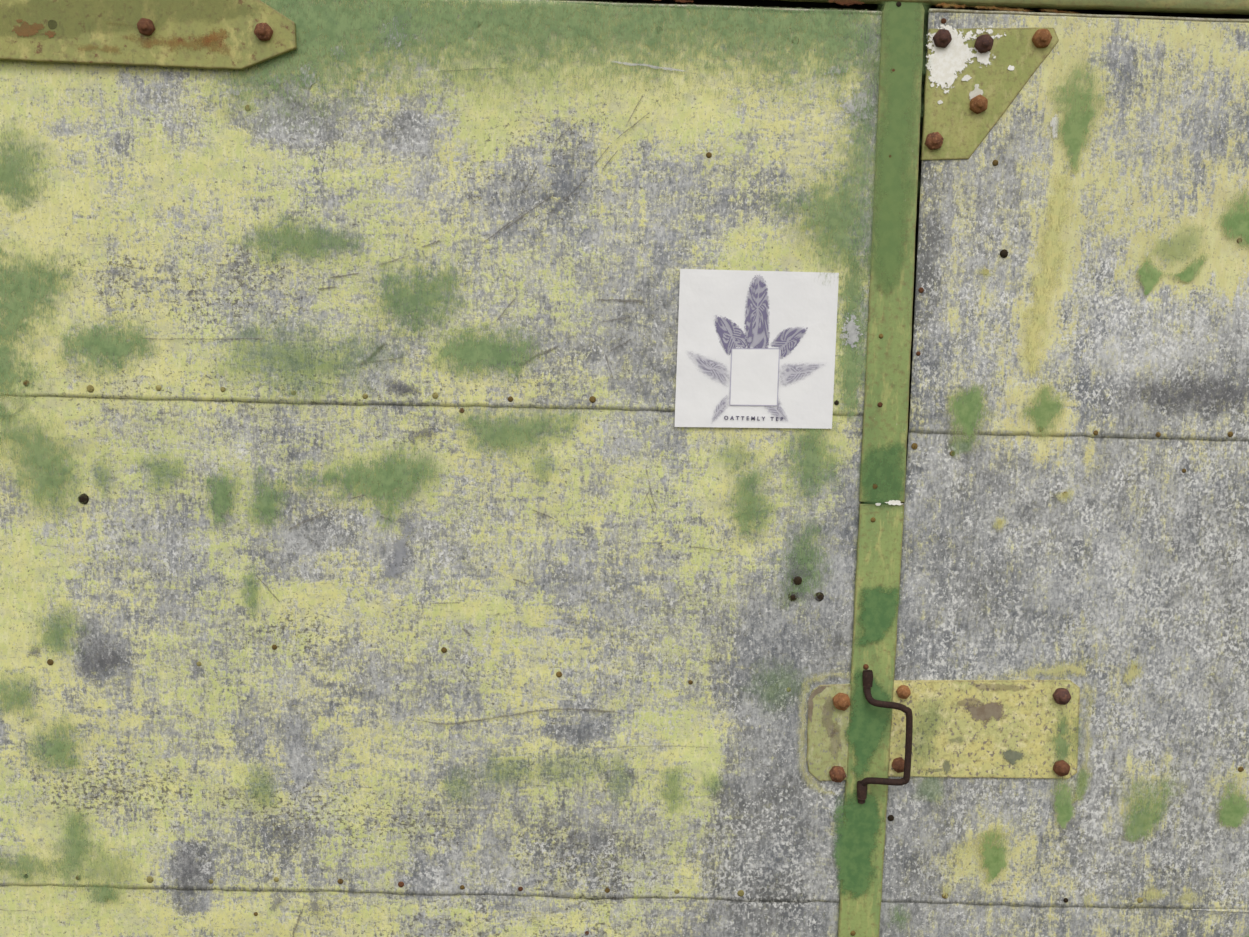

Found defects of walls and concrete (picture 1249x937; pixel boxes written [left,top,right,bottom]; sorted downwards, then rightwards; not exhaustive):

corrosion [12,19,56,38]
peeling [926,24,1006,104]